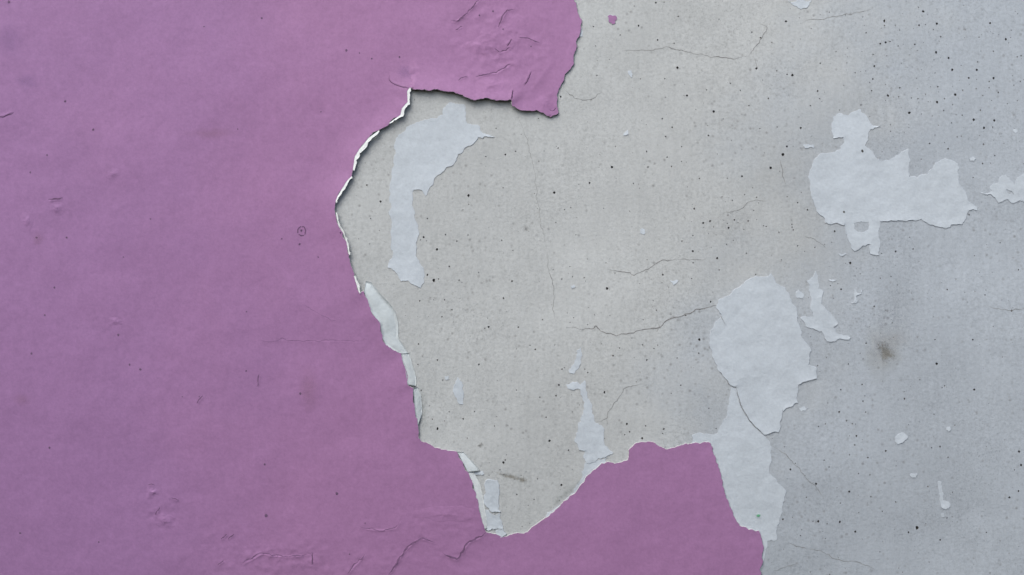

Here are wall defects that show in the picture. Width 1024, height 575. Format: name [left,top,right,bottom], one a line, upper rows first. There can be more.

peeling [0,0,786,575]
crack [520,122,723,336]